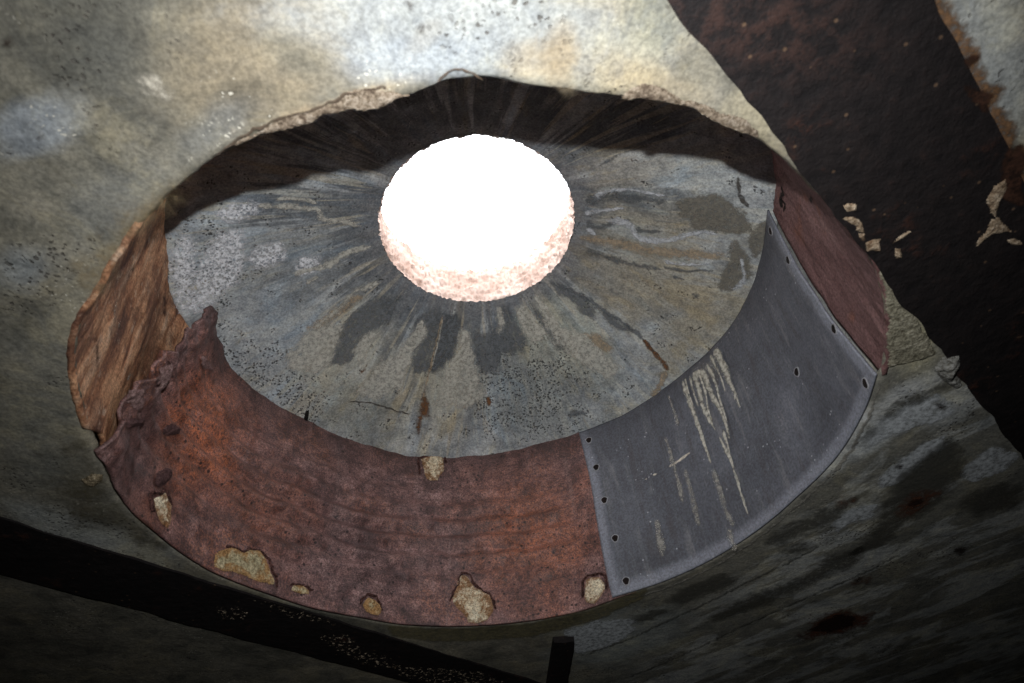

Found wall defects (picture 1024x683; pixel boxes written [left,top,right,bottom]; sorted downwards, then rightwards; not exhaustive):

corrosion [935,0,1024,205]
peeling [843,203,911,258]
peeling [977,179,1022,246]
water stain [295,245,371,284]
water stain [287,281,401,372]
water stain [356,295,622,408]
water stain [551,282,632,332]
peeling [417,456,447,481]
peeling [149,488,173,528]
peeling [214,545,314,595]
peeling [449,572,497,623]
peeling [581,572,608,604]